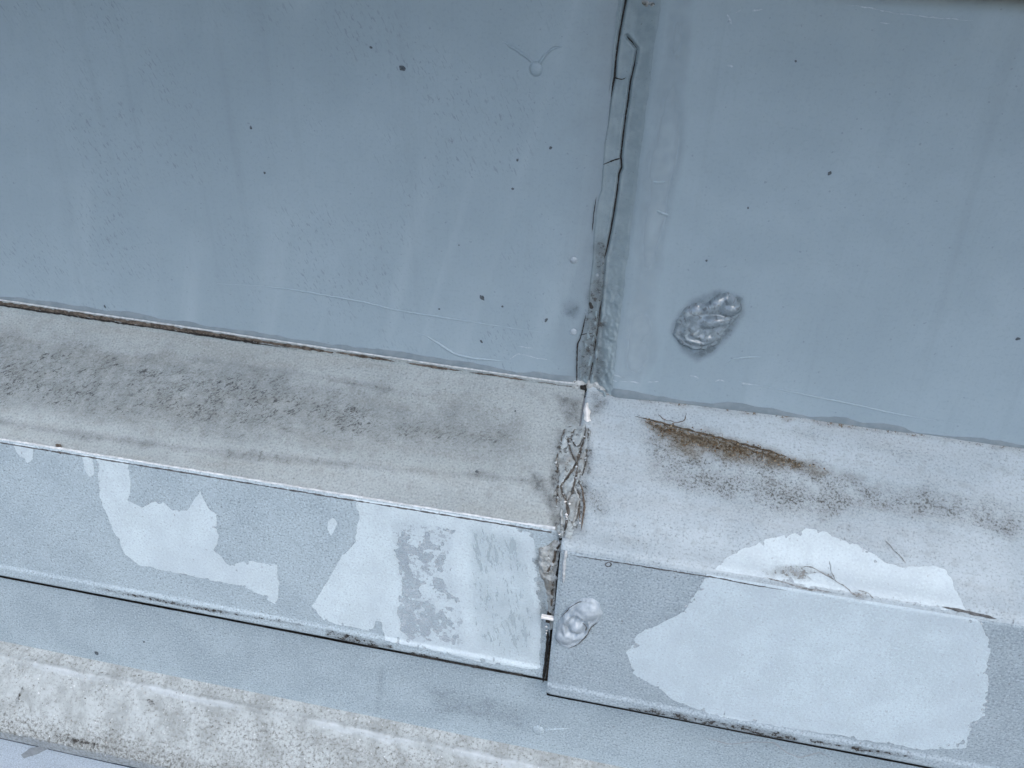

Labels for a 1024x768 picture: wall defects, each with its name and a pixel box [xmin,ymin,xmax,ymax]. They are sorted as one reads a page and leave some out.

crack [592,0,637,258]
crack [576,301,602,398]
peeling [82,454,280,604]
peeling [312,499,548,669]
crack [546,426,786,606]
corrosion [635,414,825,473]
peeling [626,528,991,750]